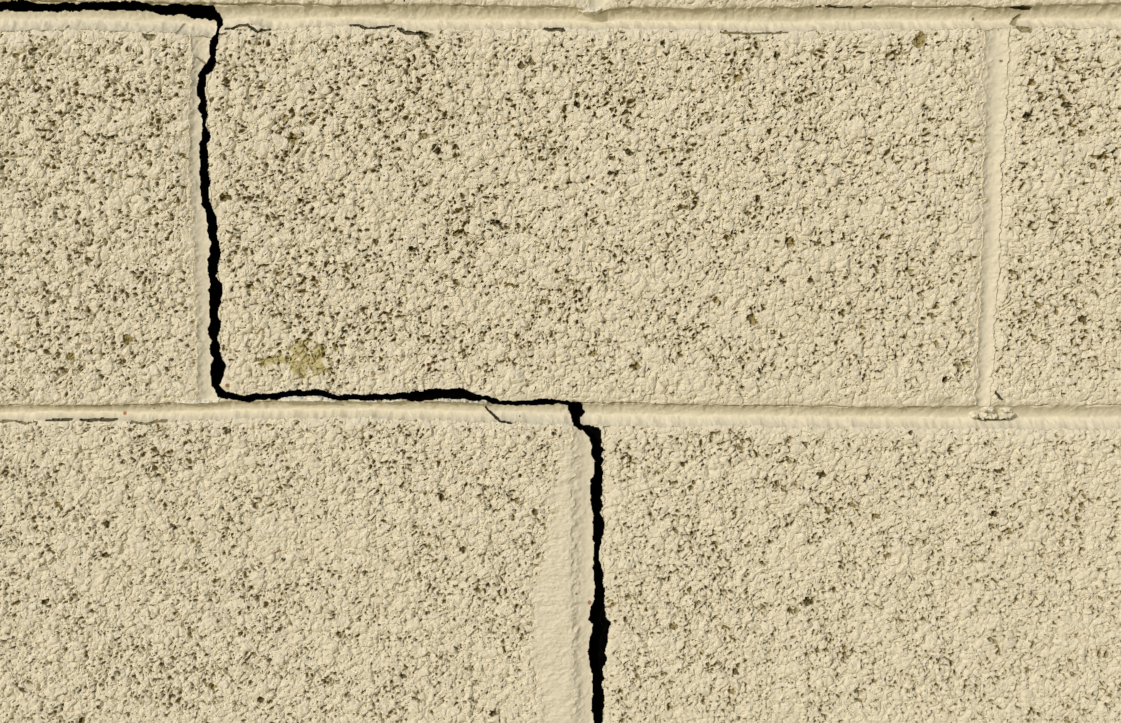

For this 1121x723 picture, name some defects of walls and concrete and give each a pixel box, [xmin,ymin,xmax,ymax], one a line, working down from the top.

crack [815,2,872,10]
crack [720,29,788,37]
crack [0,0,611,723]